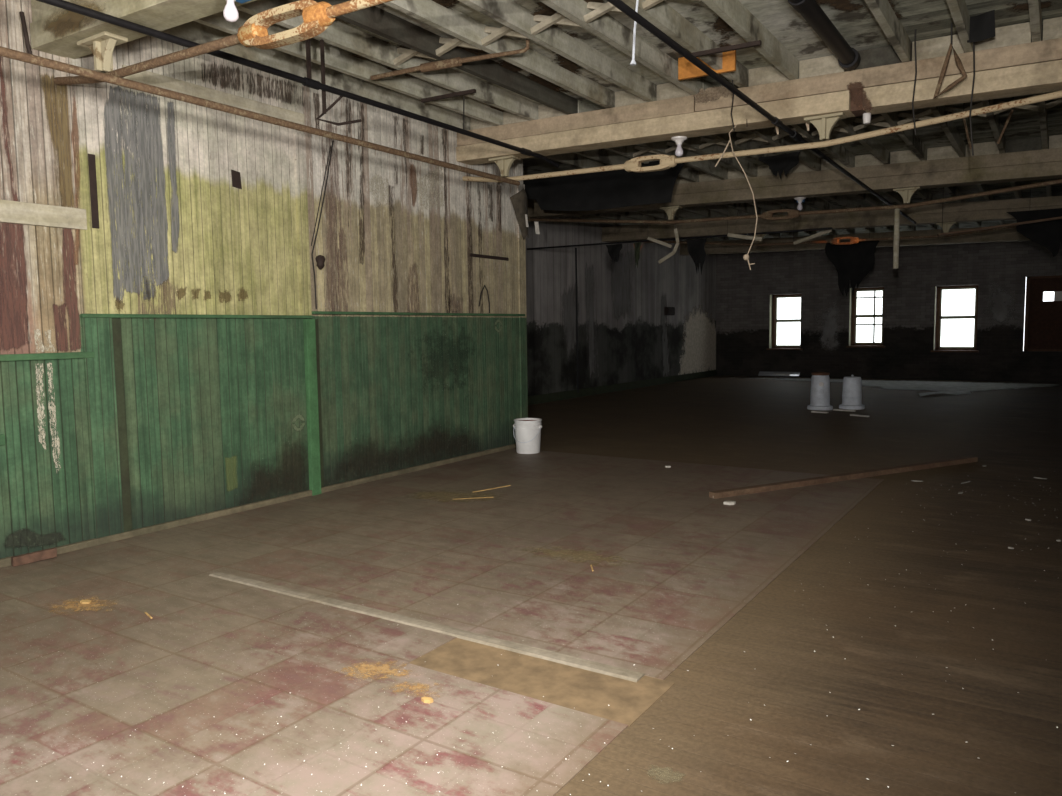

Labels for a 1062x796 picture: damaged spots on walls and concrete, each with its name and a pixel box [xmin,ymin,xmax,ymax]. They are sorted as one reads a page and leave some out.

peeling [0,56,18,201]
peeling [0,222,81,472]